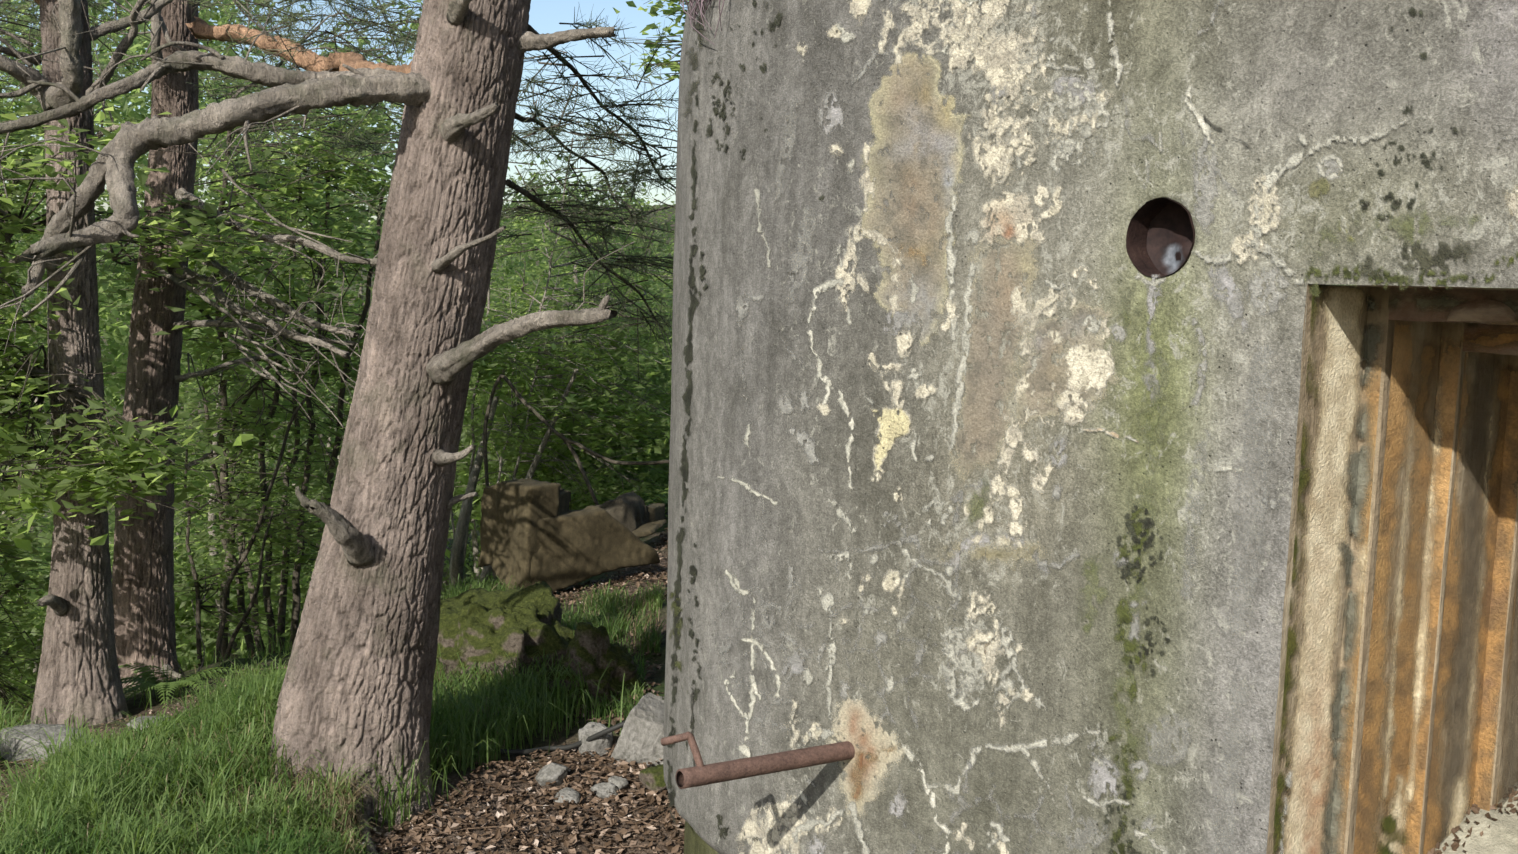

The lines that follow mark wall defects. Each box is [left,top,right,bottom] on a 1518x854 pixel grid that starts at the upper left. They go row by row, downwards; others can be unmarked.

water stain [818,91,855,169]
water stain [1305,211,1518,328]
water stain [779,391,819,464]
peeling [817,0,1139,727]
water stain [1112,275,1168,460]
spalling [686,565,701,746]
peeling [716,794,826,854]
peeling [774,699,800,749]
peeling [763,616,813,685]
rust [798,698,904,854]
water stain [1081,479,1170,854]
water stain [1273,419,1311,854]